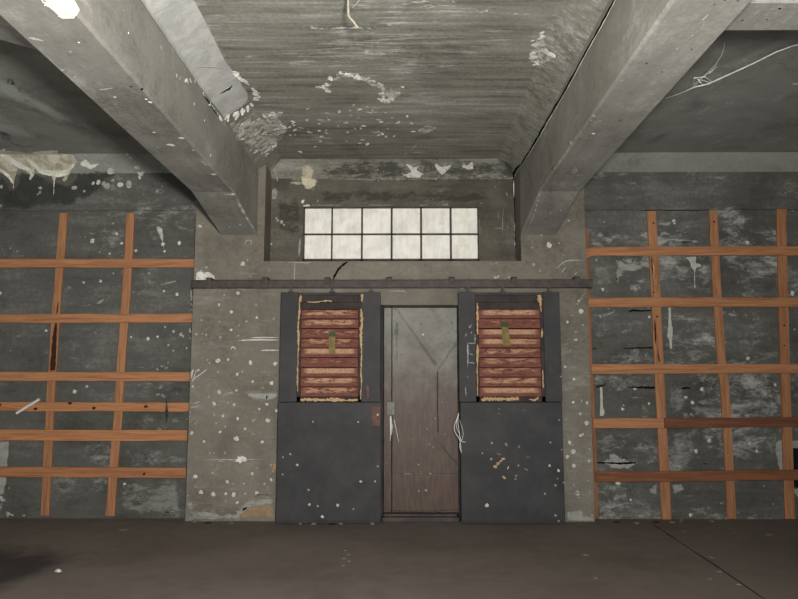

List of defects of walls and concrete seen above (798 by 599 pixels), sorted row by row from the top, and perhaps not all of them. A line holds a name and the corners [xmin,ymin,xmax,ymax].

spalling [41,0,80,19]
water stain [0,77,99,137]
peeling [203,71,421,157]
water stain [0,114,136,210]
water stain [276,145,515,235]
water stain [686,256,701,288]